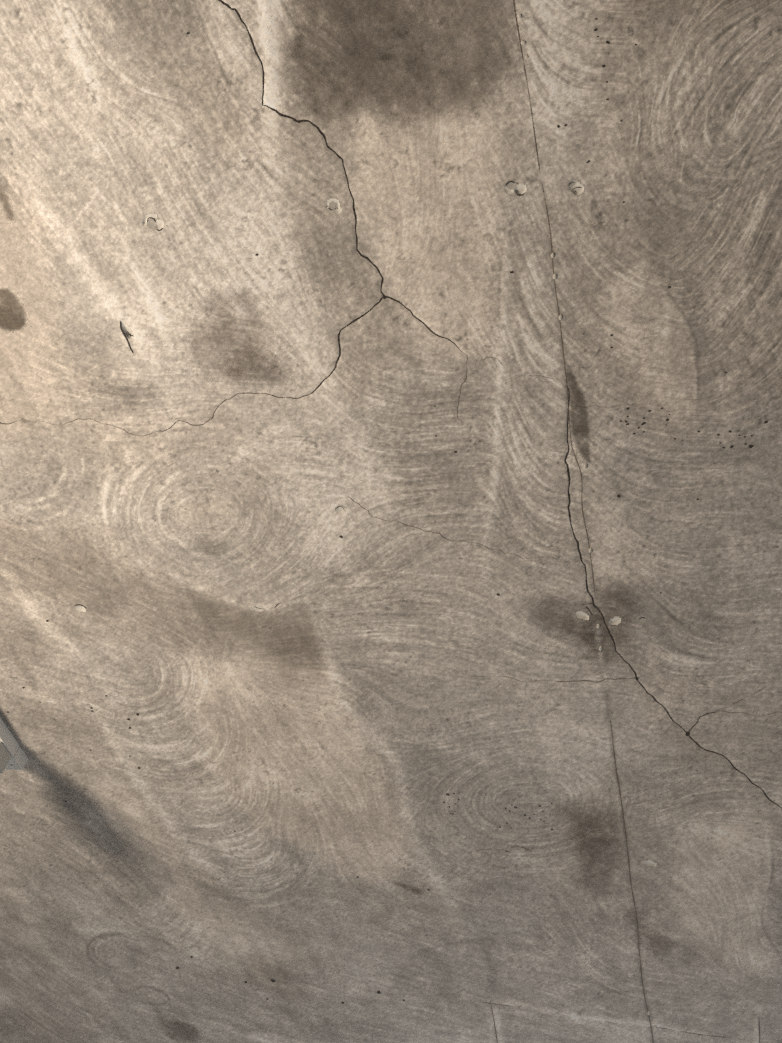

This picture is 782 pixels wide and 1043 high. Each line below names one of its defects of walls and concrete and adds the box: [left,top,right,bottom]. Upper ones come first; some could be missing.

water stain [0,290,24,329]
crack [1,0,501,436]
crack [349,375,782,809]
water stain [567,373,589,462]